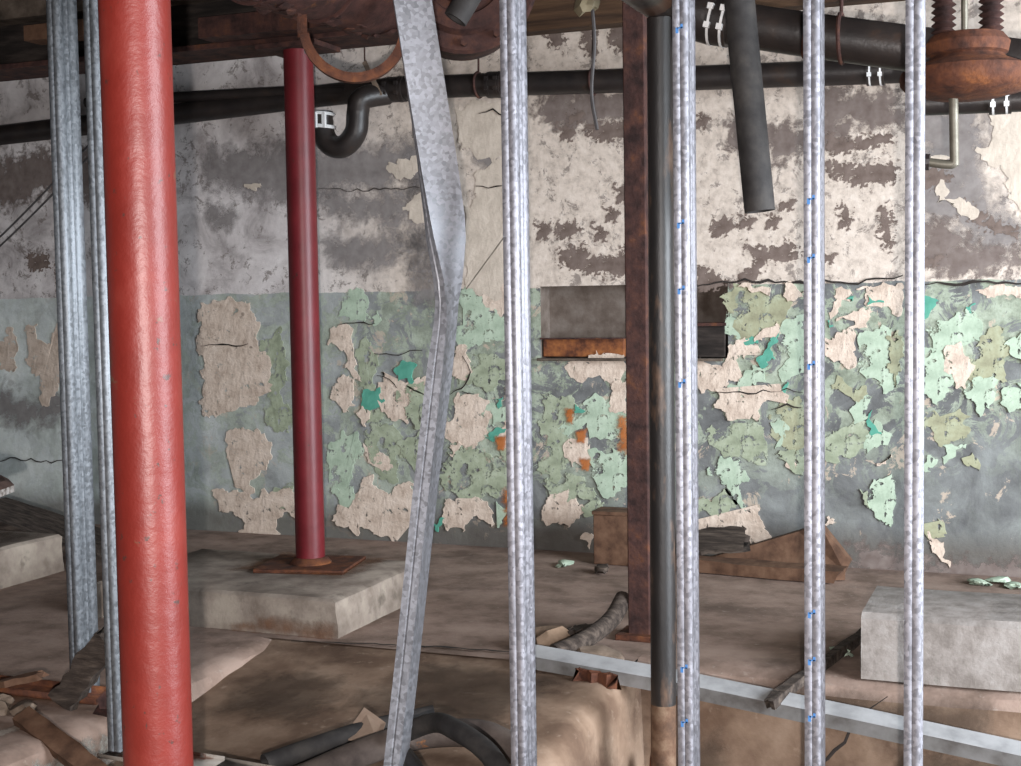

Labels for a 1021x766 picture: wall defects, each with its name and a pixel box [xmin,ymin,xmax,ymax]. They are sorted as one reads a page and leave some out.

water stain [0,146,53,206]
water stain [529,93,623,133]
water stain [721,113,738,153]
water stain [767,116,803,171]
water stain [825,85,905,150]
water stain [925,114,1021,279]
peeling [326,287,426,541]
peeling [434,100,507,532]
peeling [537,351,627,528]
peeling [697,199,804,543]
peeling [825,282,904,466]
peeling [924,284,1021,472]